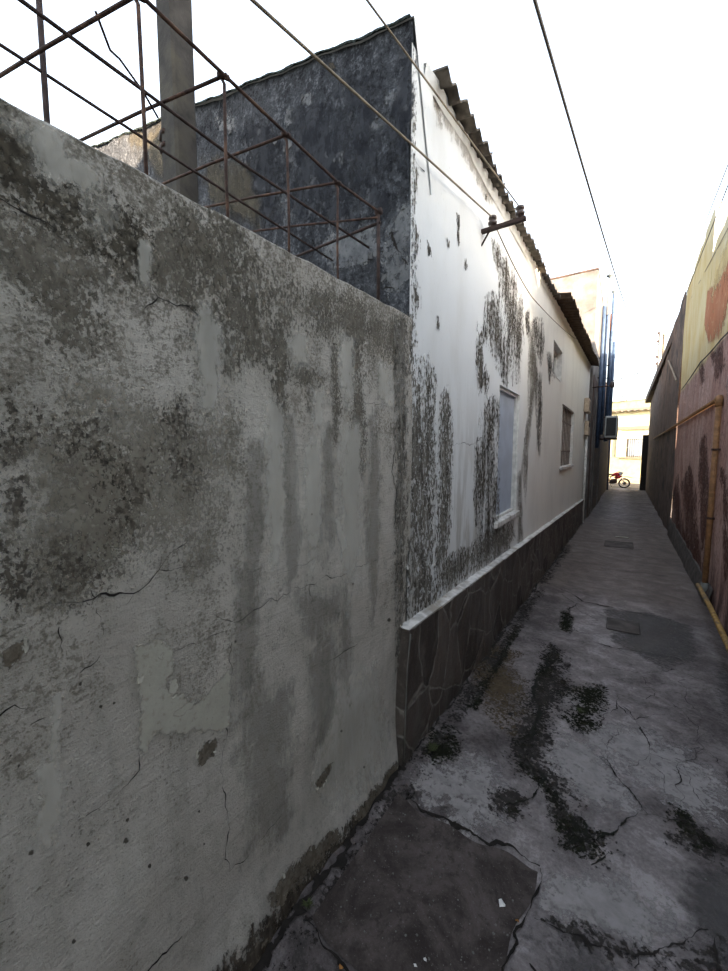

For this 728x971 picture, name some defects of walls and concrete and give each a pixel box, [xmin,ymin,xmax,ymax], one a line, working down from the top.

leakage [0,36,421,626]
peeling [699,242,728,386]
leakage [497,319,538,552]
crack [45,524,211,673]
crack [176,557,376,676]
crack [148,938,181,971]
crack [220,719,282,871]
leakage [212,545,728,971]
crack [251,763,725,971]
crack [497,589,728,865]